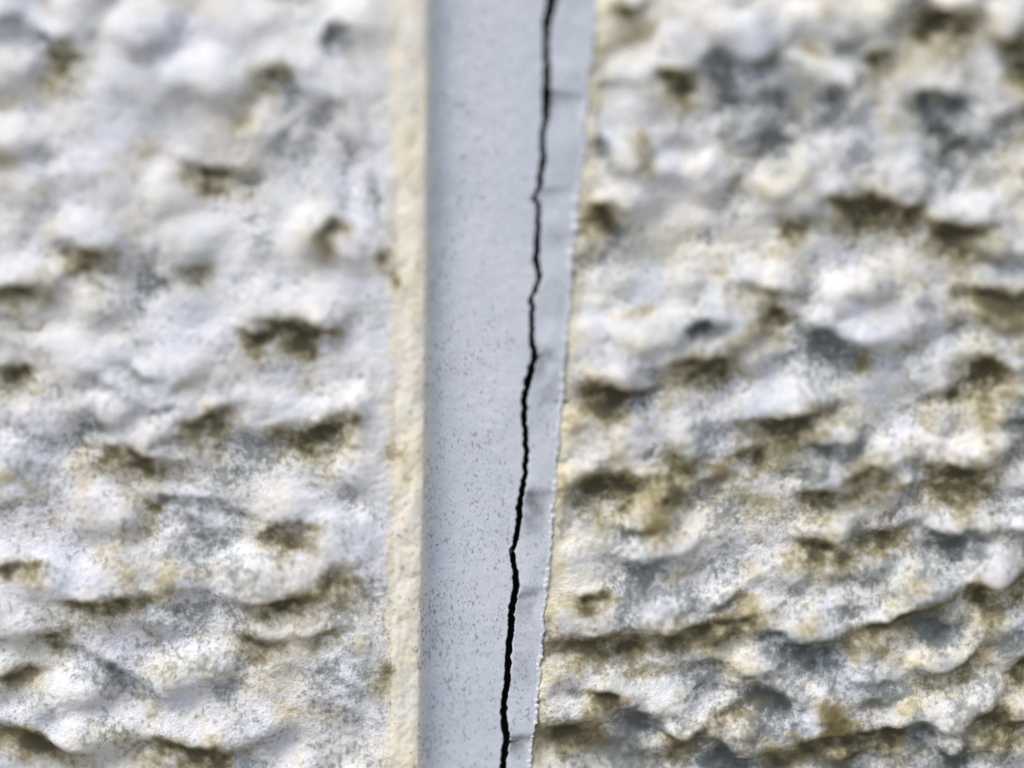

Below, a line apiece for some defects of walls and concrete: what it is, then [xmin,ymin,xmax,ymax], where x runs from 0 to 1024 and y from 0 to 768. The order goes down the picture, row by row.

crack [500,0,558,768]